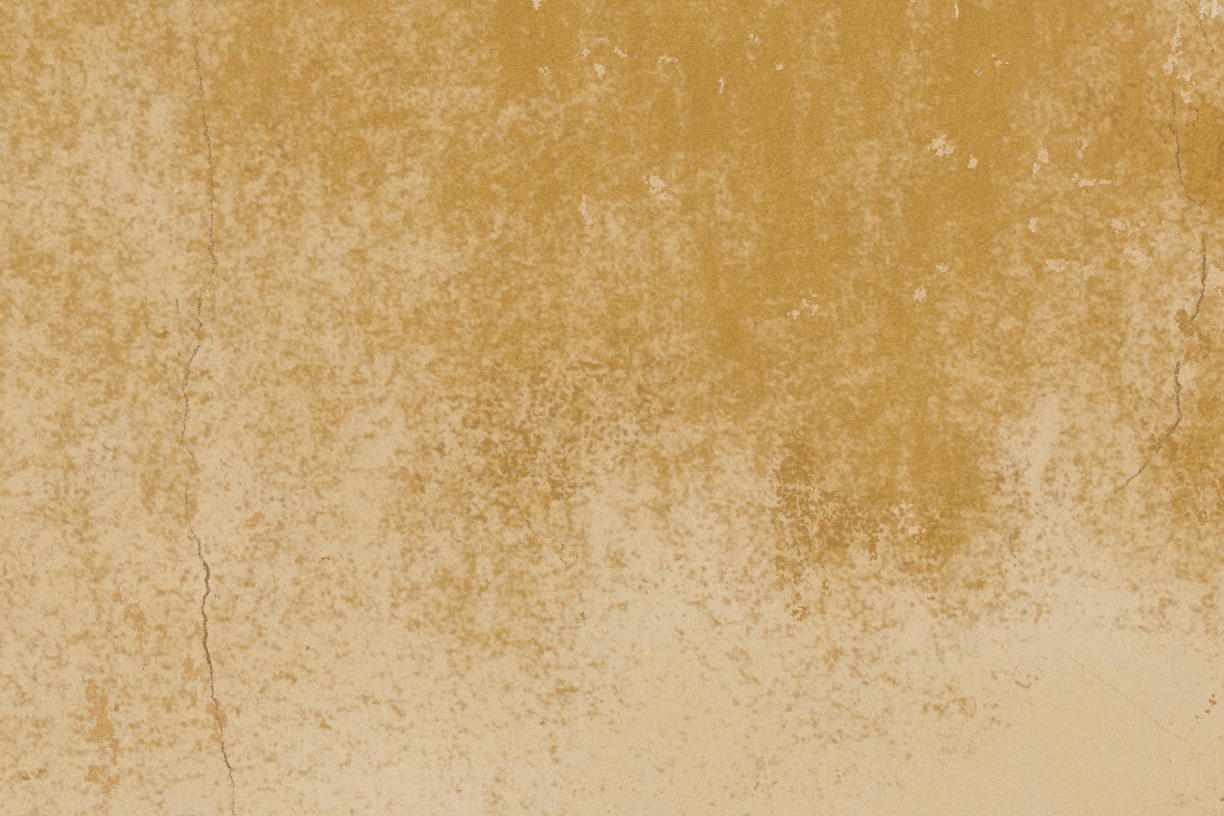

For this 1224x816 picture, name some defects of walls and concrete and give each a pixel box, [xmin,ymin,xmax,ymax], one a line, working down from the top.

crack [1185,1,1217,59]
crack [1114,91,1216,495]
crack [178,0,238,815]
water stain [477,390,579,580]
water stain [769,412,885,627]
water stain [918,470,993,601]
water stain [1165,391,1224,540]